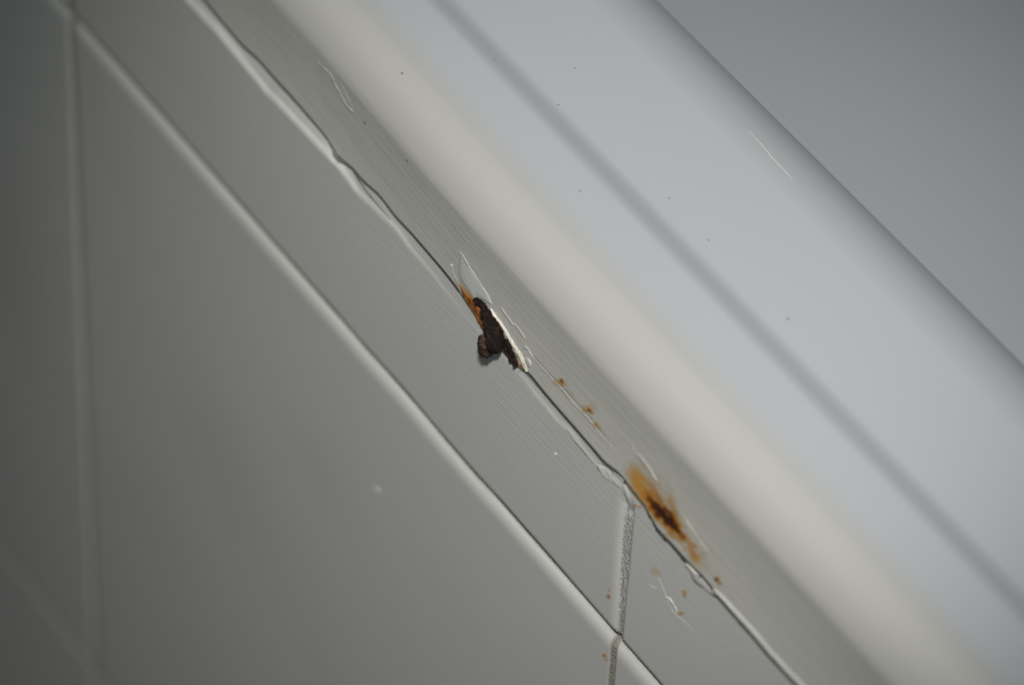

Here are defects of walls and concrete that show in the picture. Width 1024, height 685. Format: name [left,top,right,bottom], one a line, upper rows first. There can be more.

crack [203,0,458,291]
peeling [452,251,528,372]
crack [517,356,795,685]
corrosion [629,469,699,561]